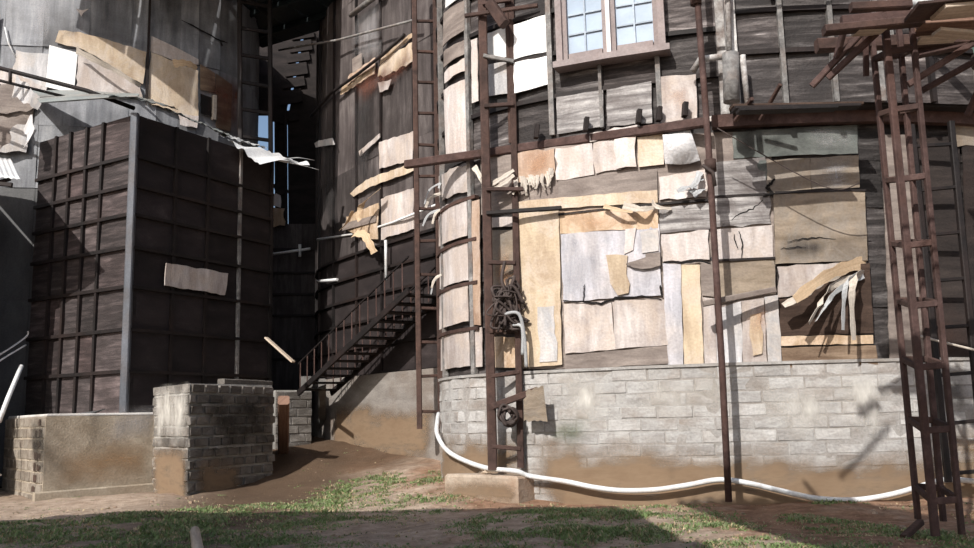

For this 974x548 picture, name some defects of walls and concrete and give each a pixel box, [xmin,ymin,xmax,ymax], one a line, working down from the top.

peeling [472,165,554,196]
crack [732,178,776,258]
crack [563,260,711,305]
peeling [781,256,866,340]